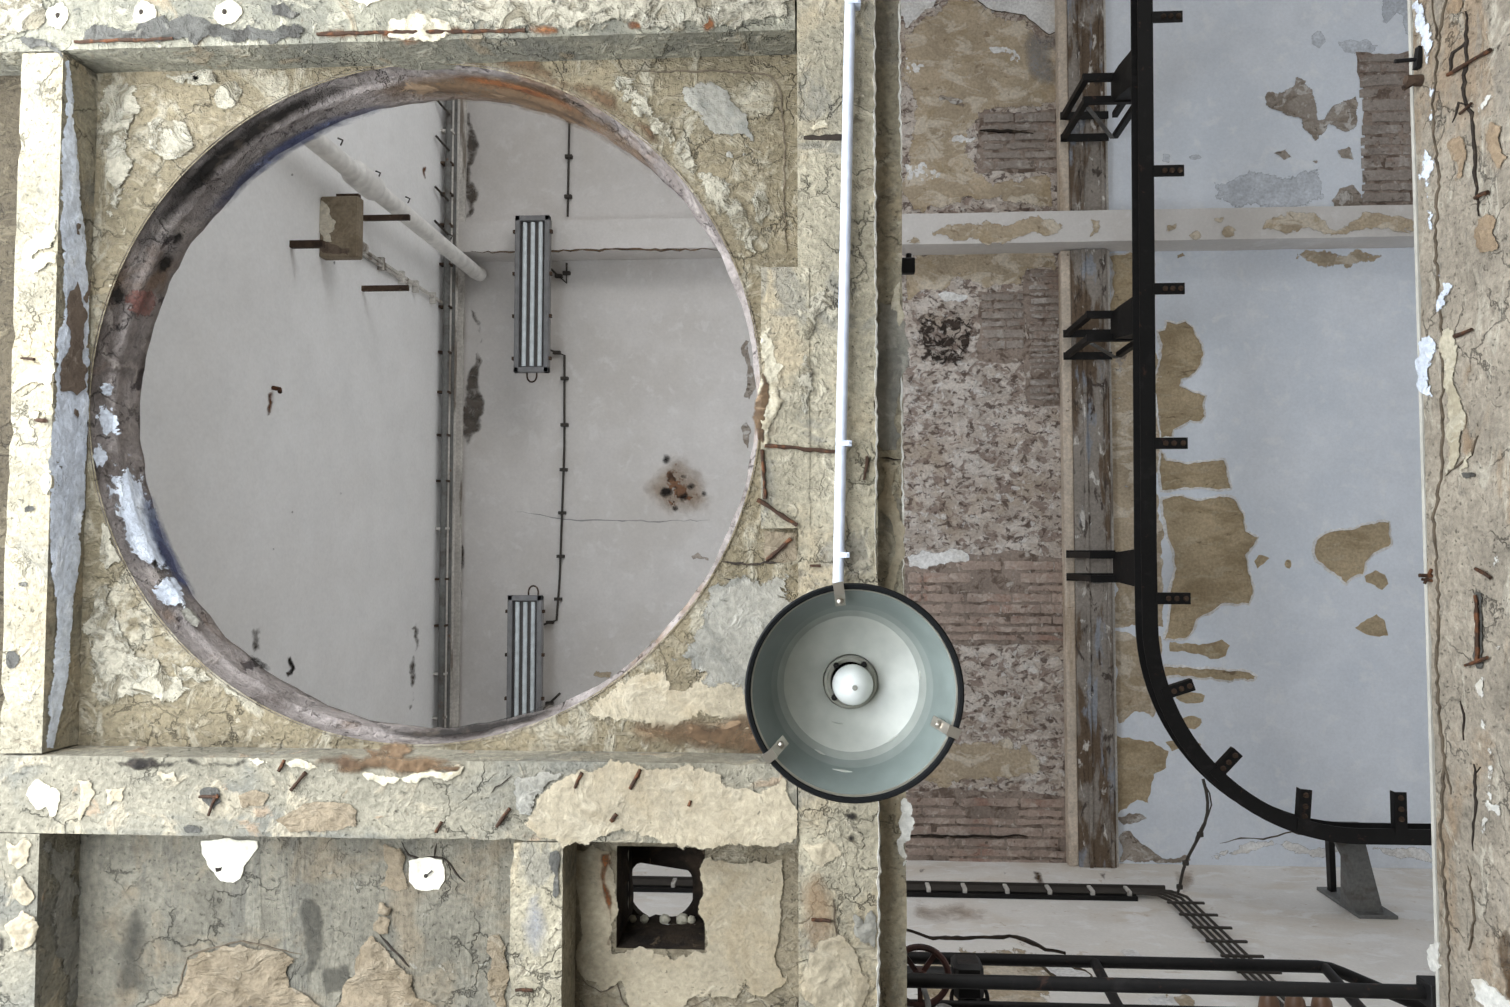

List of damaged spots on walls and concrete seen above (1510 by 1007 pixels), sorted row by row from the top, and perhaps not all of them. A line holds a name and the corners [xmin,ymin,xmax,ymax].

flaking render [613,76,770,253]
flaking render [1214,0,1466,237]
peeling [13,3,526,748]
rust [661,456,705,510]
flaking render [863,0,1063,646]
flaking render [1111,342,1134,552]
flaking render [1155,320,1291,745]
spalling [1311,519,1393,590]
crack [1431,0,1481,1007]
flaking render [1115,583,1178,813]
flaking render [149,844,437,1007]
flaking render [1456,979,1510,1007]